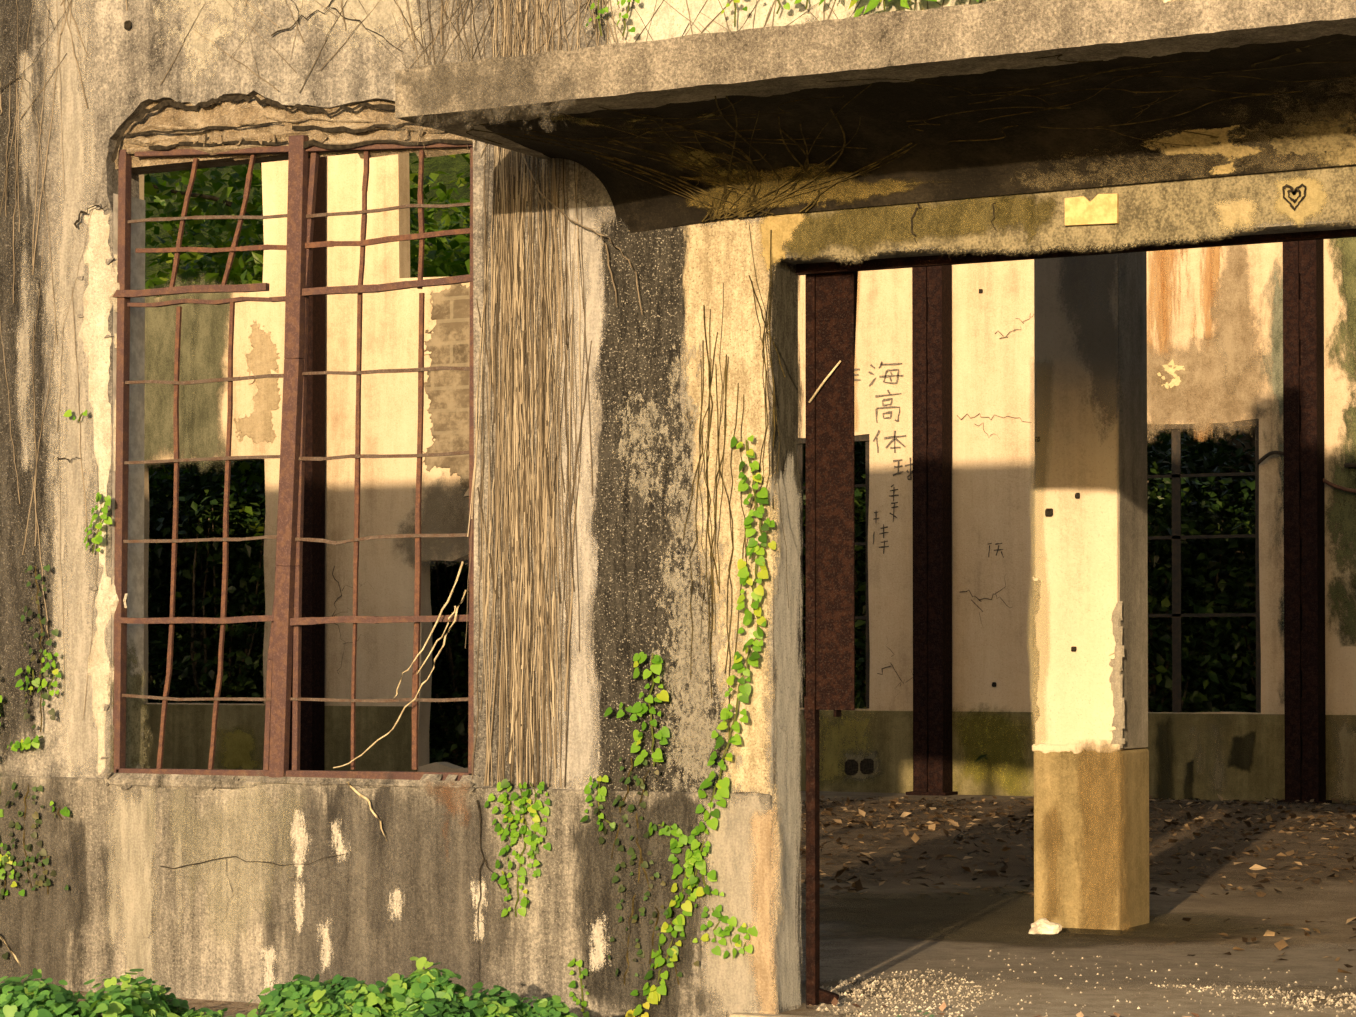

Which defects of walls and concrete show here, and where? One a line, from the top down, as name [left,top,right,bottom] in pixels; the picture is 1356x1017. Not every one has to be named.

spalling [111,94,473,163]
flaking render [77,203,133,790]
leakage [1325,237,1356,645]
leakage [554,190,777,1017]
leakage [103,789,157,990]
leakage [261,945,280,989]
leakage [290,810,311,932]
leakage [318,920,333,971]
leakage [331,818,347,862]
leakage [389,889,402,920]
leakage [471,881,488,940]
leakage [798,744,1317,946]